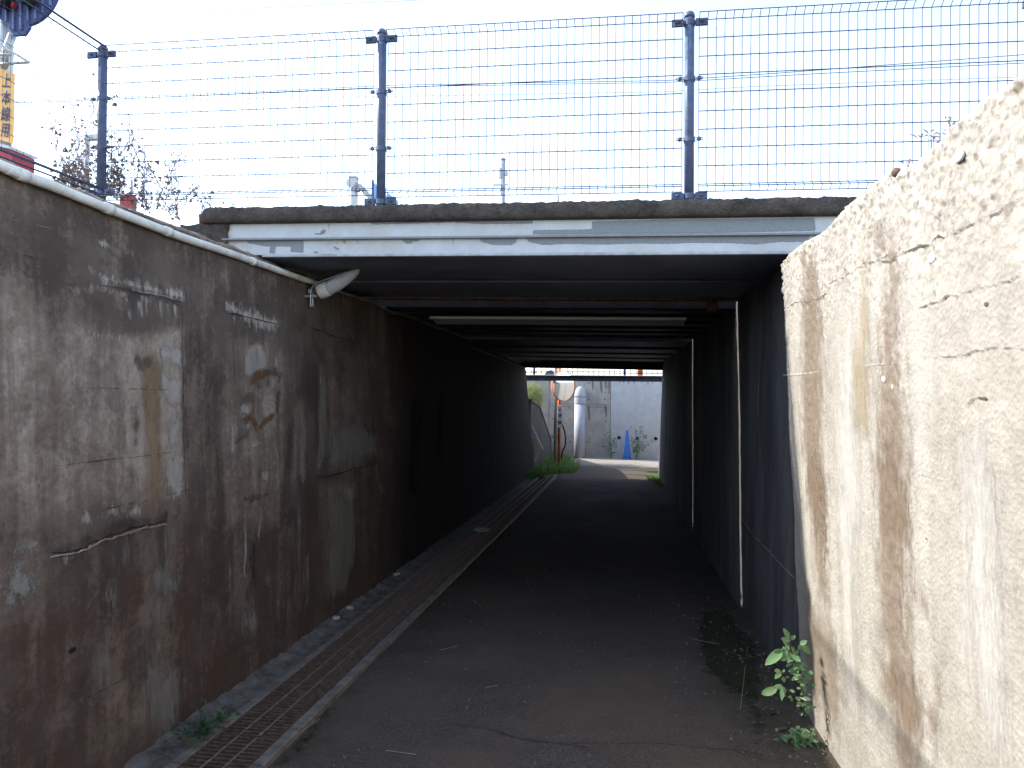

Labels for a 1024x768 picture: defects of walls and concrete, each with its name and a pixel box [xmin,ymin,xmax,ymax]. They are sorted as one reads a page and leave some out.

peeling [371,218,815,245]
crack [784,196,1023,309]
peeling [225,301,278,332]
corrosion [237,369,281,441]
leakage [802,264,827,598]
leakage [877,253,917,768]